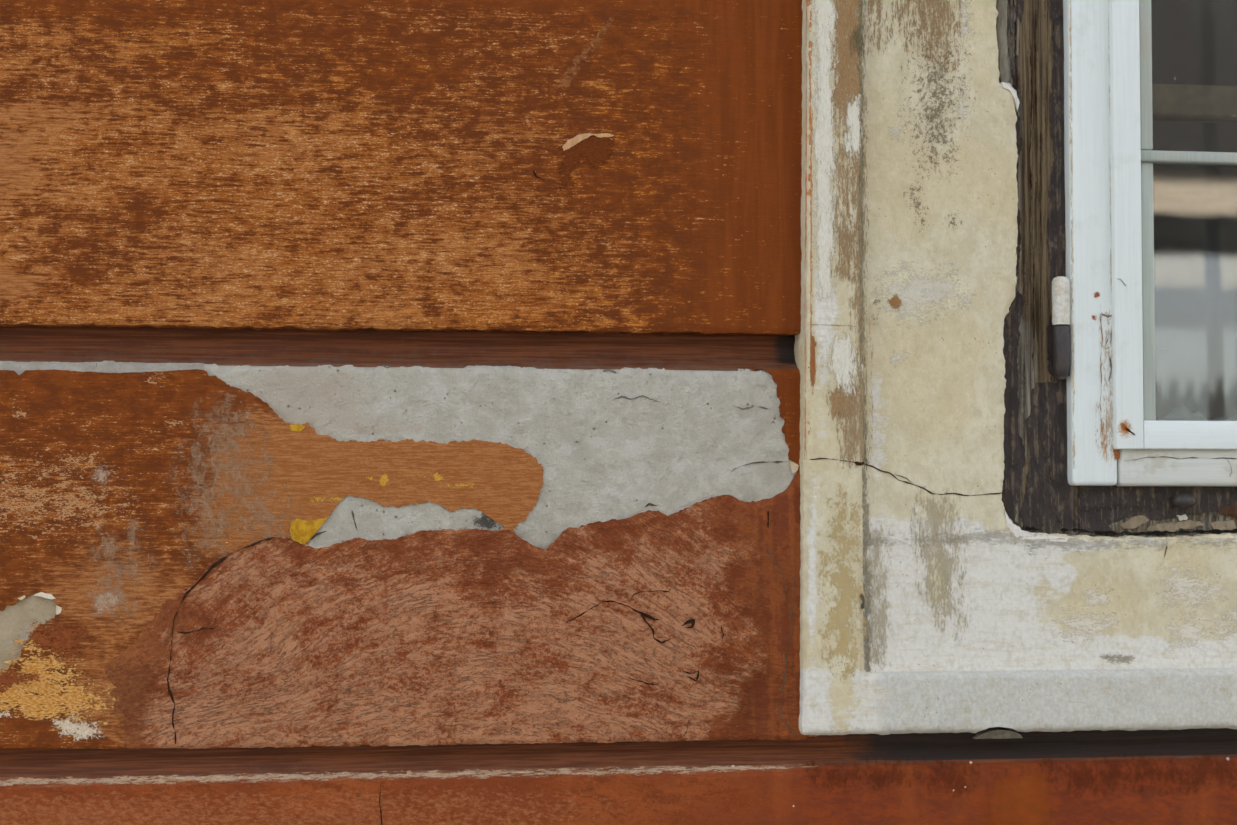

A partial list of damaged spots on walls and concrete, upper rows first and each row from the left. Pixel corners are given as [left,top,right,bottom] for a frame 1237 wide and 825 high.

peeling [533,132,616,191]
peeling [826,0,978,469]
peeling [1001,0,1024,179]
peeling [1047,0,1066,286]
spalling [0,361,799,552]
crack [810,458,1007,496]
peeling [1002,209,1237,542]
peeling [0,592,127,749]
crack [167,537,303,744]
crack [565,588,724,643]